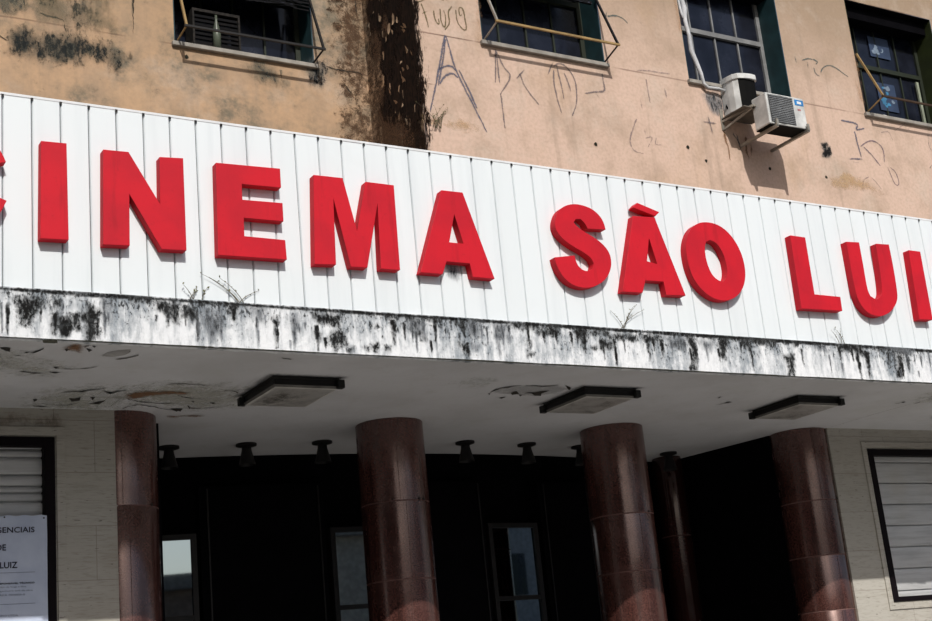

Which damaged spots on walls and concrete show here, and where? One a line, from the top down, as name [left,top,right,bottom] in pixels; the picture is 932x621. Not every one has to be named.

water stain [6,0,132,70]
water stain [0,287,932,384]
peeling [488,385,571,399]